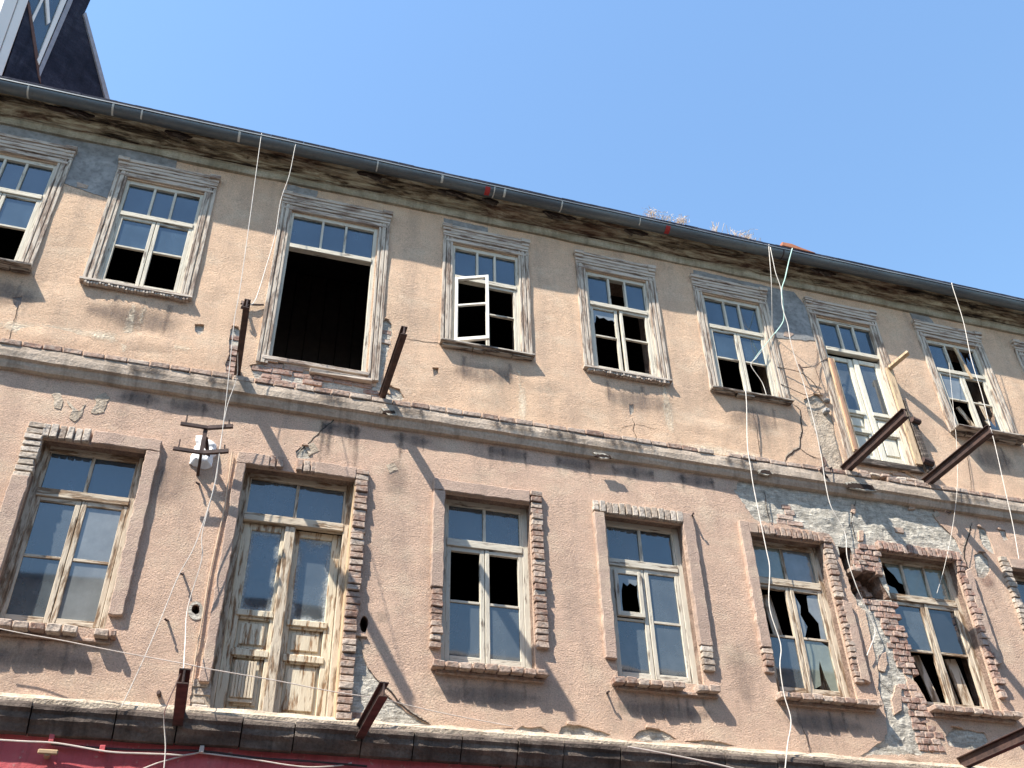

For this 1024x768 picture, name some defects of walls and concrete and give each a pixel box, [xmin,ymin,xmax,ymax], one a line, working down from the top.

flaking render [225,324,240,377]
flaking render [250,317,404,414]
peeling [51,392,110,422]
crack [299,420,334,451]
crack [752,403,817,462]
flaking render [734,470,1008,757]